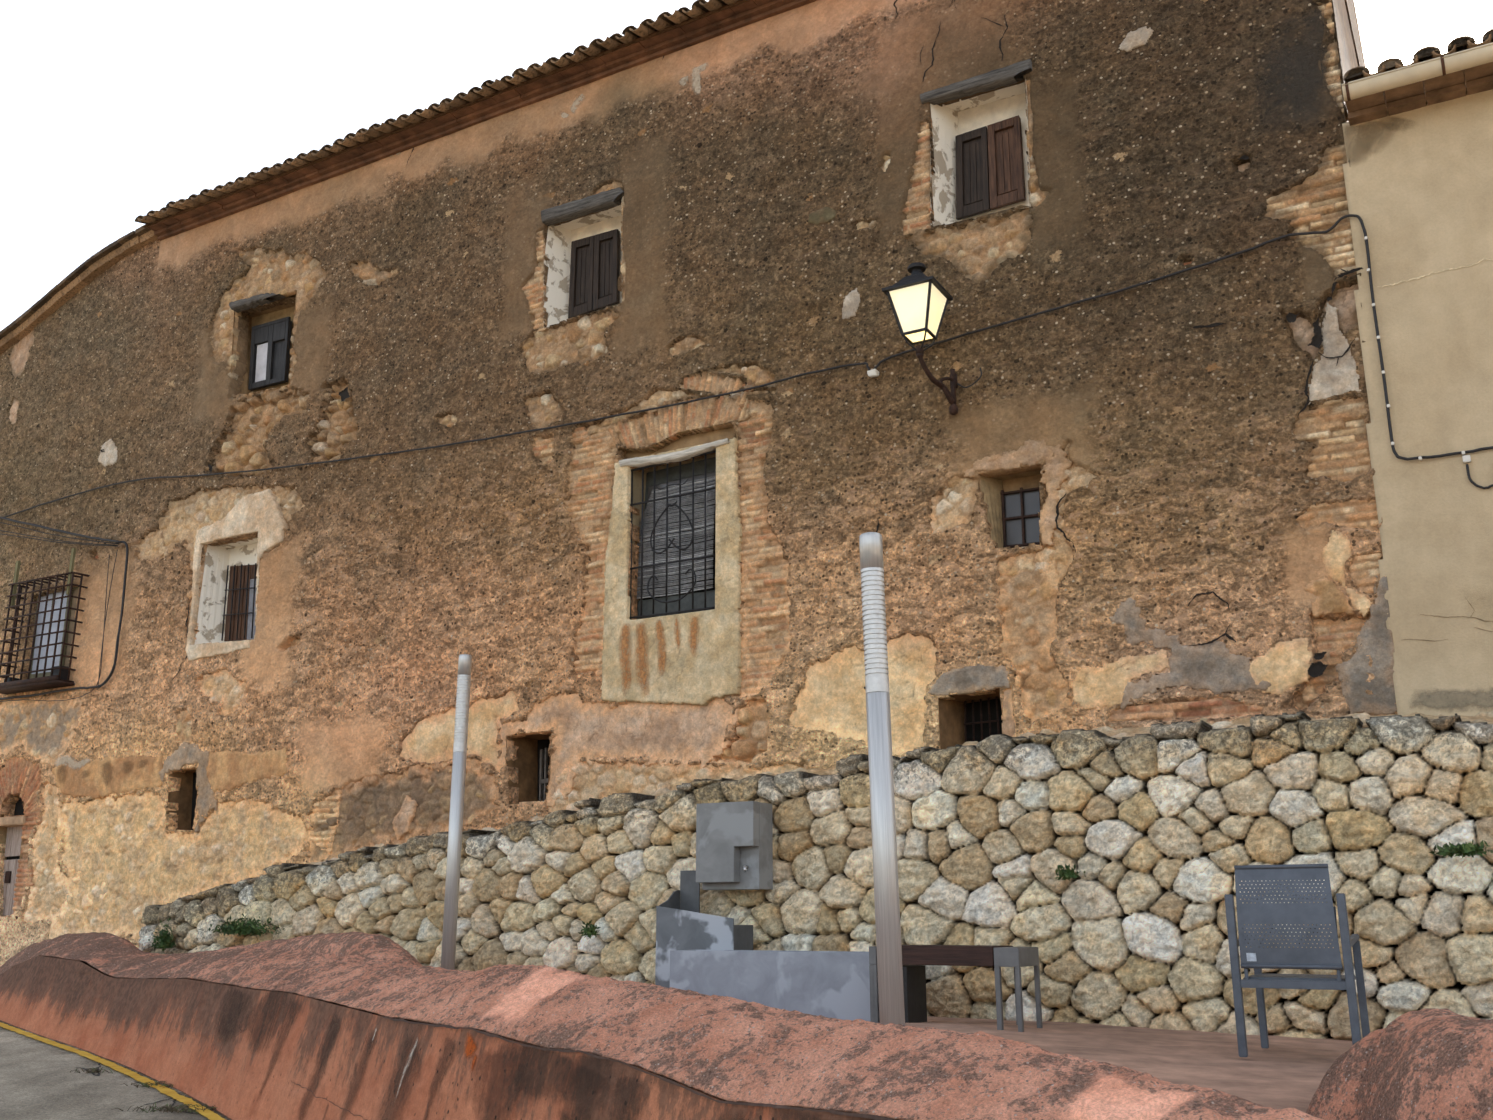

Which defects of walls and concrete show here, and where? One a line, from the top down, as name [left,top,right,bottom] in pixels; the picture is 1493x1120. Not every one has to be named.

crack [920,0,1008,81]
flaking render [1265,143,1359,359]
spalling [208,248,327,404]
spalling [307,380,358,462]
flaking render [1293,398,1370,482]
flaking render [400,371,792,808]
rust [620,617,697,691]
flaking render [789,645,868,746]
flaking render [887,633,938,755]
flaking render [1071,499,1382,722]
crack [1403,599,1493,641]
flaking render [0,755,163,918]